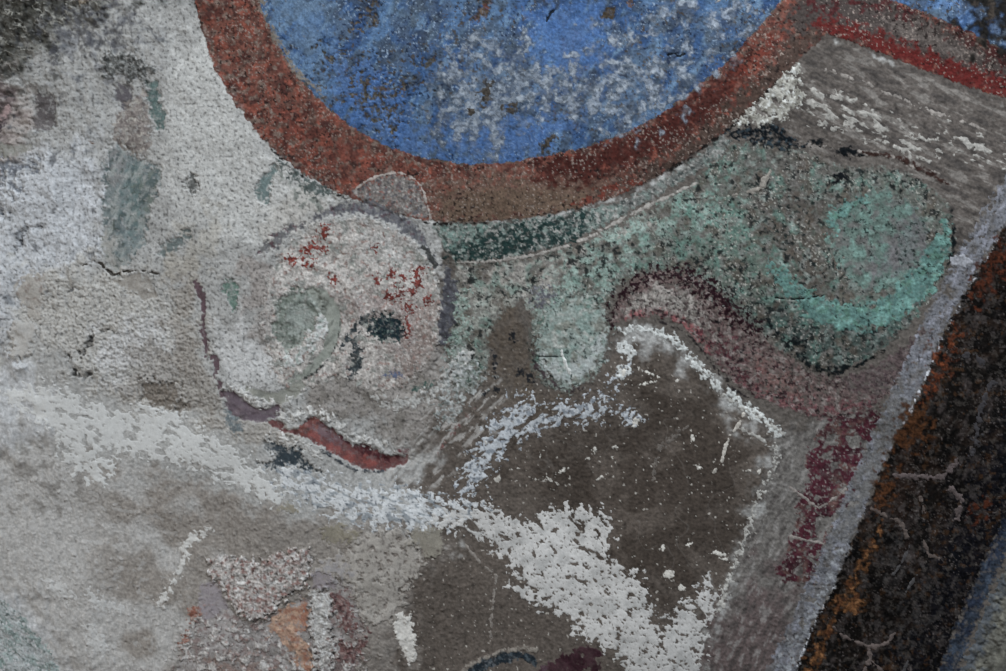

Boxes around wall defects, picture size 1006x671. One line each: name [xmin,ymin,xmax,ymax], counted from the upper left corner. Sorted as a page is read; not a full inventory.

water stain [0,0,65,76]
peeling [603,356,633,396]
peeling [613,324,724,393]
peeling [739,406,786,486]
peeling [448,476,500,508]
peeling [713,572,735,617]
peeling [332,620,372,671]